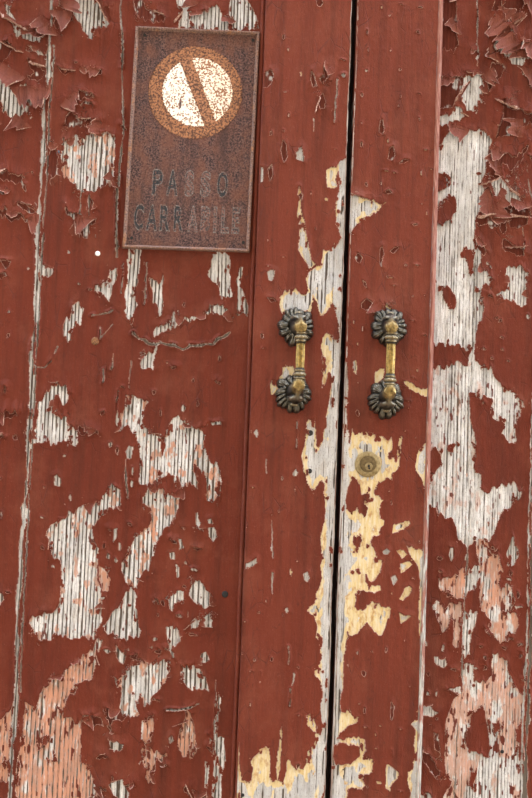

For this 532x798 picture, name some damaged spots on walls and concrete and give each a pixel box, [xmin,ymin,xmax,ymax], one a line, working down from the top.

peeling [0,249,261,798]
peeling [237,0,532,798]